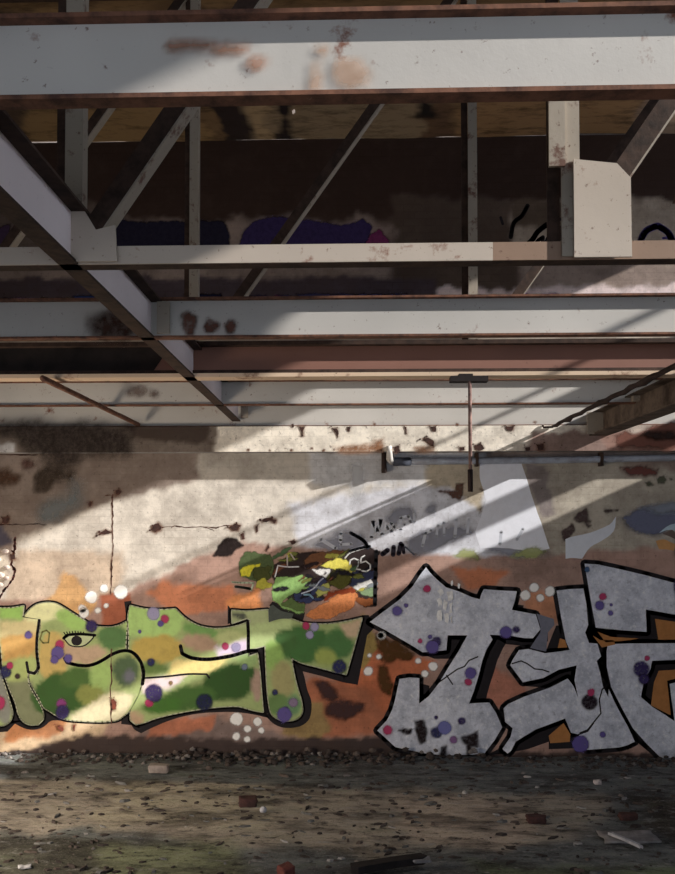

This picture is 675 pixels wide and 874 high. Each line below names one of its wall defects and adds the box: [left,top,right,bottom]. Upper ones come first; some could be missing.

corrosion [167,41,245,53]
corrosion [181,312,236,335]
corrosion [311,440,383,453]
crack [162,524,231,532]
peeling [561,508,591,541]
crack [105,494,114,595]
crack [107,648,115,724]